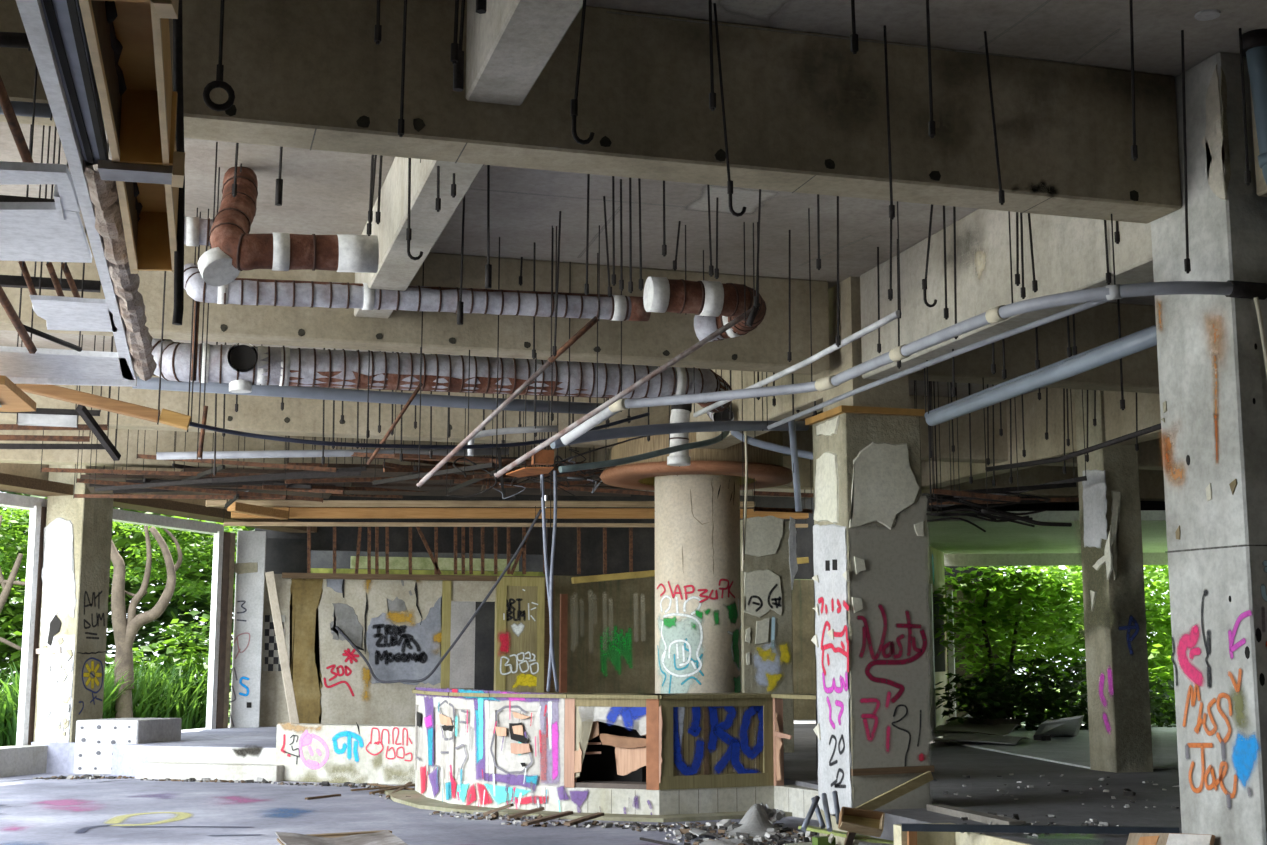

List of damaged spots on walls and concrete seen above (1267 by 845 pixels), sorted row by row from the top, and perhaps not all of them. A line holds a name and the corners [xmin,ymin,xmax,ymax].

flaking render [744,516,798,665]
flaking render [816,416,840,436]
flaking render [811,442,920,816]
flaking render [914,521,924,536]
rust [1164,437,1183,483]
rust [1210,321,1221,462]